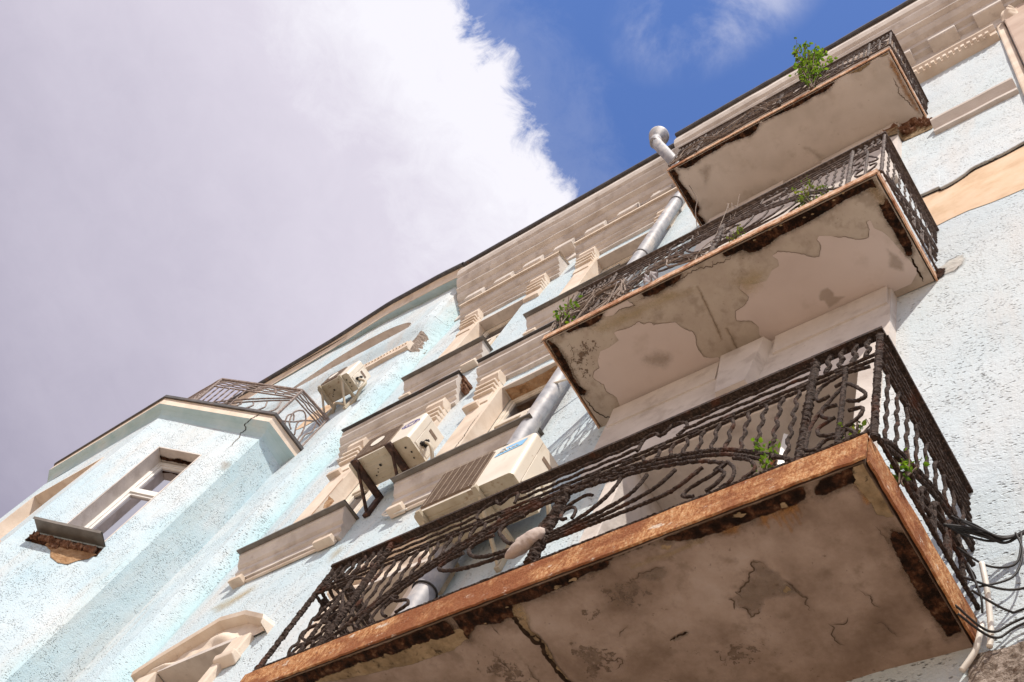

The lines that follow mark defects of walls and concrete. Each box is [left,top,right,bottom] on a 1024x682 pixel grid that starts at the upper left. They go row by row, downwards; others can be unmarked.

spalling [670,81,835,225]
spalling [877,116,933,141]
peeling [723,179,917,341]
spalling [25,530,103,564]
spalling [282,464,894,682]
spalling [890,531,961,637]
crack [491,616,571,682]